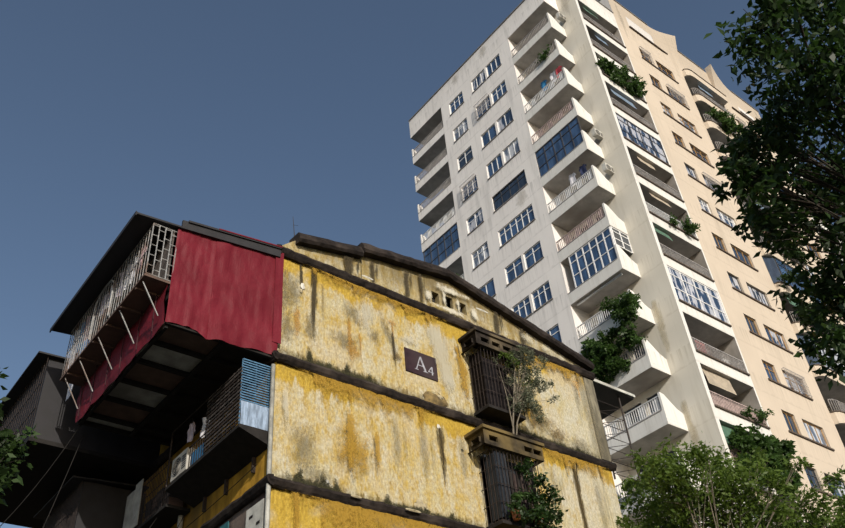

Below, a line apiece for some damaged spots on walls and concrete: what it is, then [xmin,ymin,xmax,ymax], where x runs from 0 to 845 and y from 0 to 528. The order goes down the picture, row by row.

leakage [285,254,469,398]
leakage [525,355,580,382]
leakage [301,372,434,475]
leakage [542,448,605,486]
leakage [292,492,445,528]